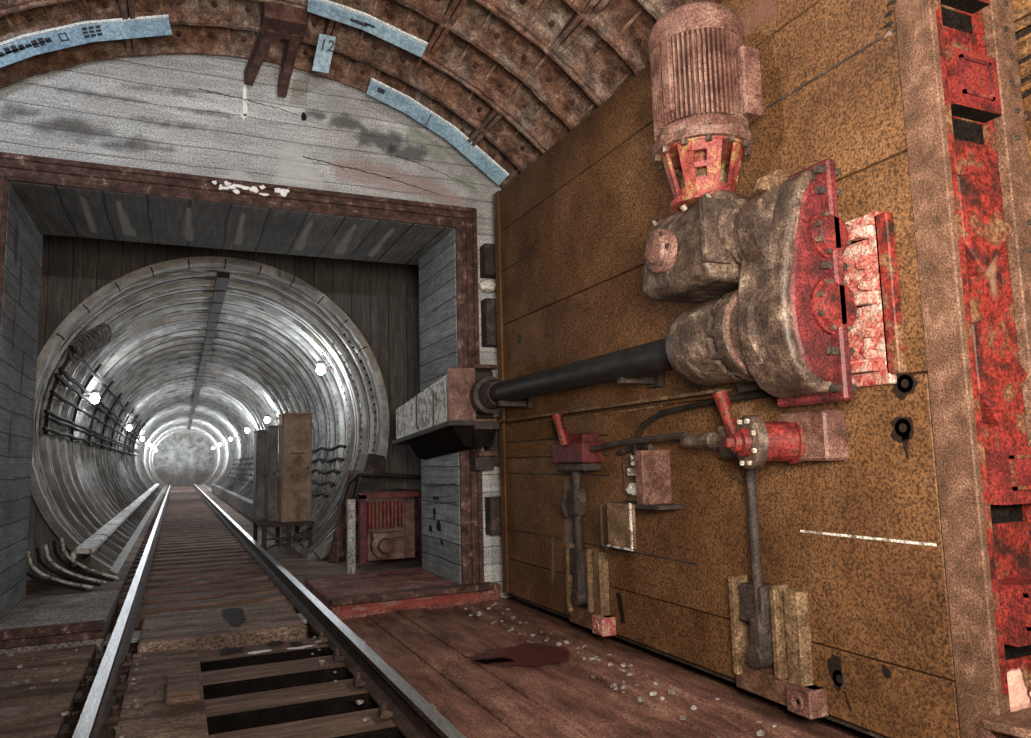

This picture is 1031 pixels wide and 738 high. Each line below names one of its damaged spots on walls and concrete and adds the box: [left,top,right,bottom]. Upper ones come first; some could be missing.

damp [240,81,249,120]
damp [43,120,92,134]
rust [986,259,995,295]
peeling [1007,669,1031,712]